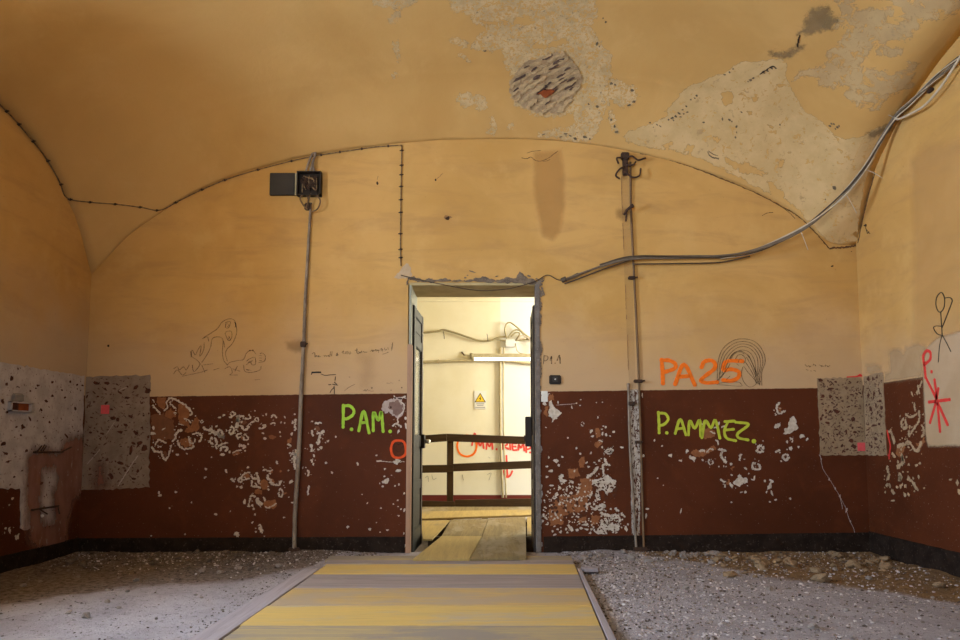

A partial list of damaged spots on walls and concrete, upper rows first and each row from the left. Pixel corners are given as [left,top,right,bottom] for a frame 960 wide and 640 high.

peeling [449,0,887,244]
spalling [406,270,545,326]
peeling [1,368,337,537]
peeling [381,396,407,434]
peeling [535,341,582,428]
peeling [535,416,629,549]
peeling [679,402,808,502]
spalling [818,375,925,502]